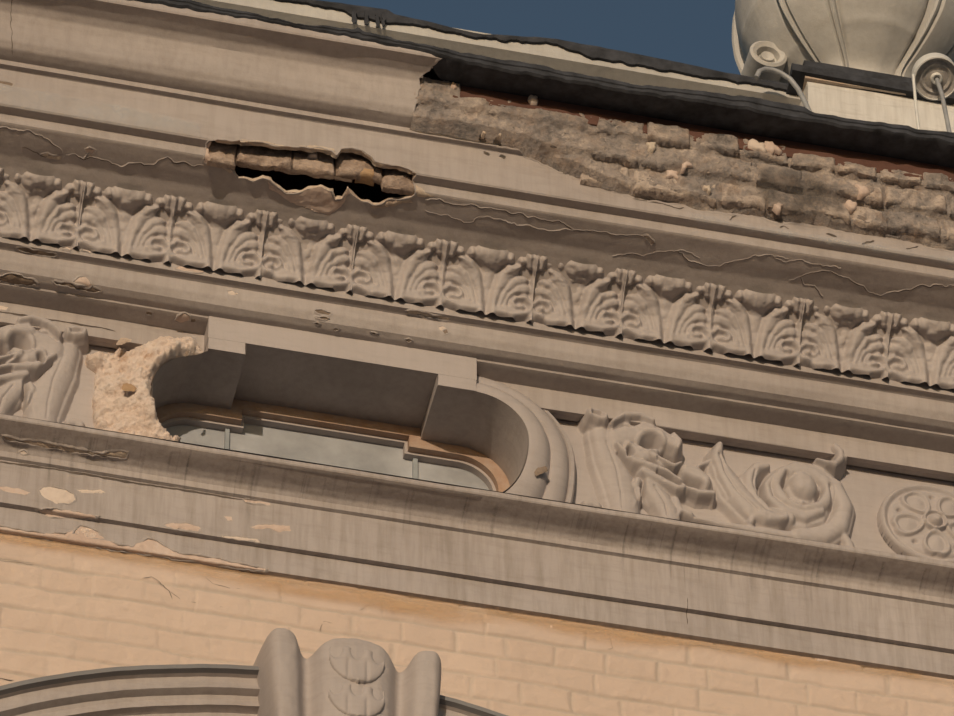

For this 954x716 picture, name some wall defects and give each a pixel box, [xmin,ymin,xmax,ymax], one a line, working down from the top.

crack [0,126,205,167]
flaking render [202,138,435,214]
flaking render [410,58,954,253]
peeling [0,272,103,294]
crack [425,198,954,296]
flaking render [85,336,203,442]
peeling [1,434,130,461]
peeling [0,485,273,575]
peeling [219,522,294,544]